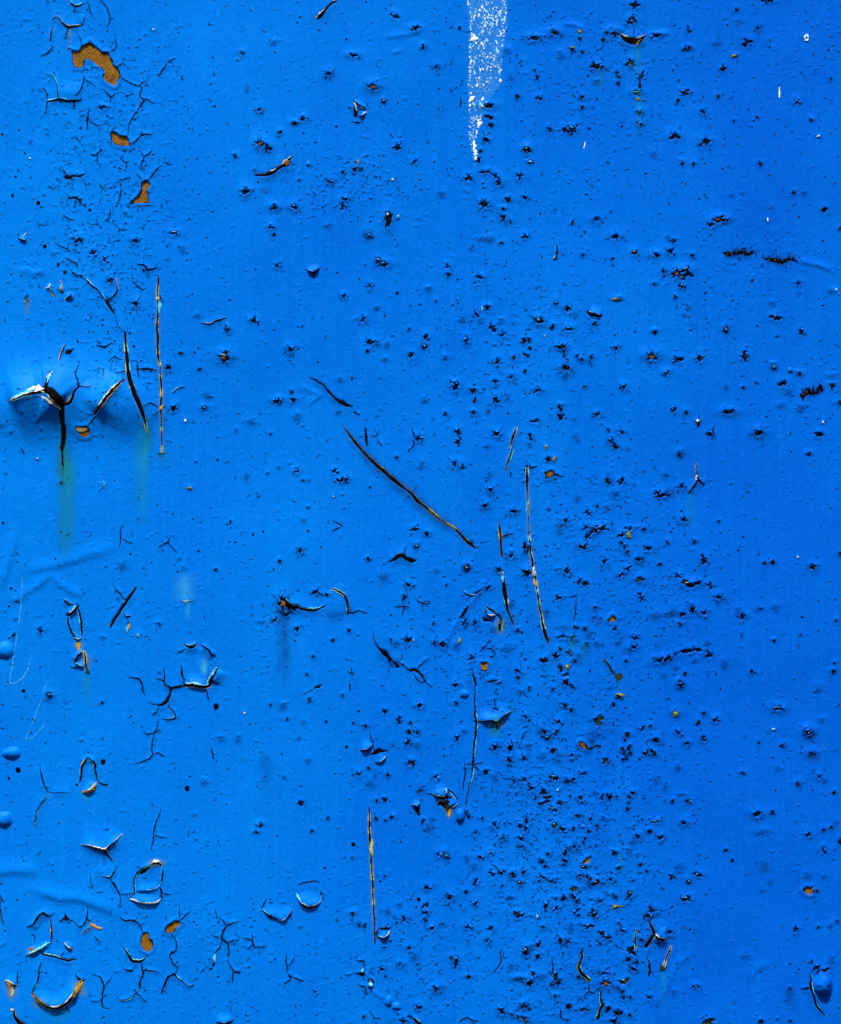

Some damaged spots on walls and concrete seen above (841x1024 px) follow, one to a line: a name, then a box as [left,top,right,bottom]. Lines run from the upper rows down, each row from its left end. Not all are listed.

peeling [67,33,125,91]
corrosion [481,13,731,143]
corrosion [22,9,188,401]
crack [0,0,441,493]
crack [676,235,831,377]
corrosion [723,226,841,347]
crack [0,216,739,1024]
corrosion [370,308,752,1022]
peeling [4,907,84,1013]
peeling [129,857,170,906]
peeling [135,915,186,959]
peeling [259,878,327,923]